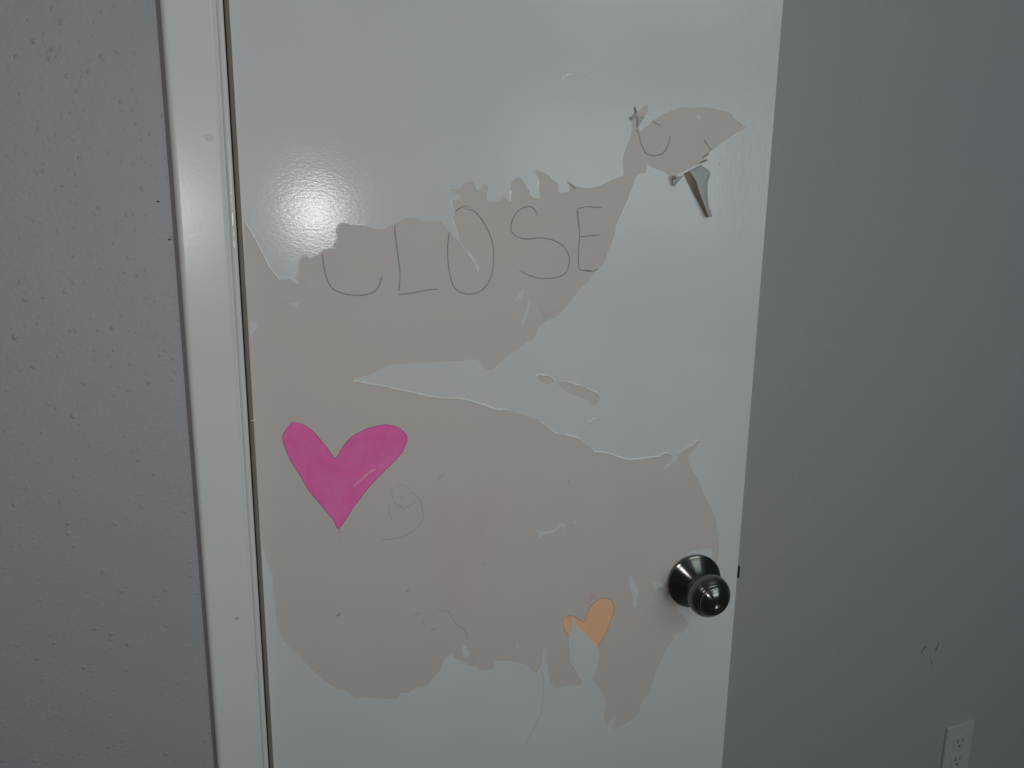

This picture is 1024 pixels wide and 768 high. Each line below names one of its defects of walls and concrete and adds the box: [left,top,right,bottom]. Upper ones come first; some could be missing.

peeling [242,105,746,730]